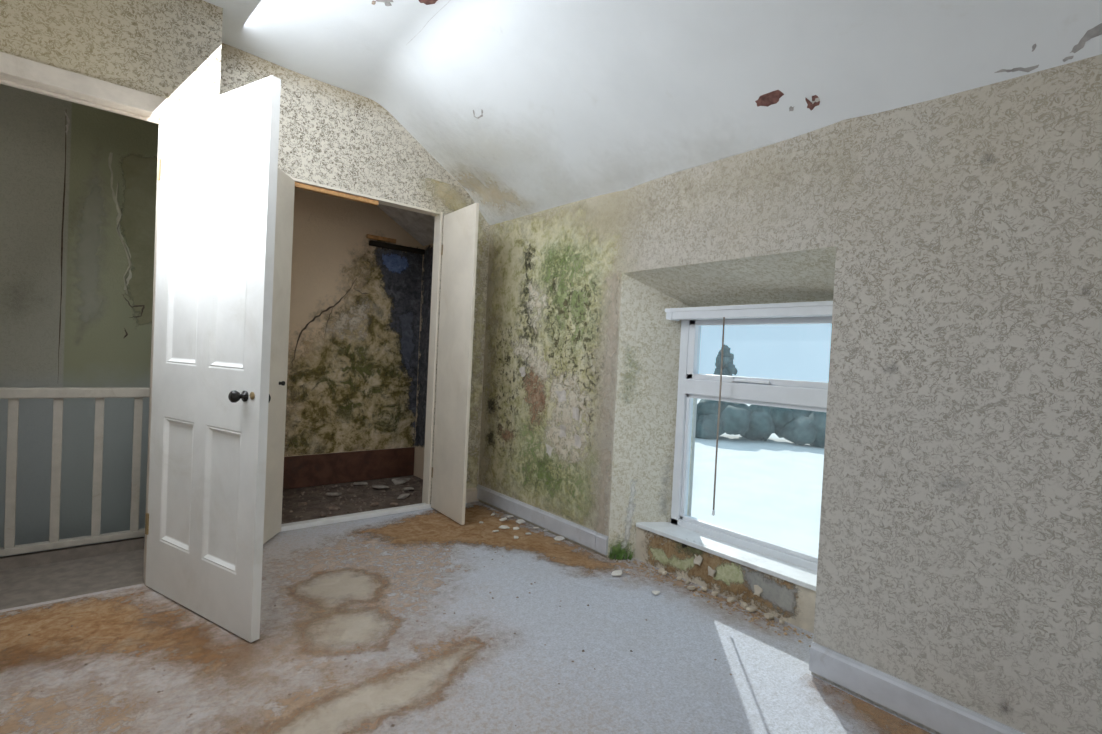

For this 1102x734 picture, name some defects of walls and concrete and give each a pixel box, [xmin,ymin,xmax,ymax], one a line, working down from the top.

spalling [406,0,451,45]
peeling [1063,23,1102,62]
peeling [995,65,1039,73]
spalling [755,90,794,111]
spalling [805,95,820,110]
flaking render [374,245,433,447]
leakage [429,178,620,523]
flaking render [645,531,798,618]